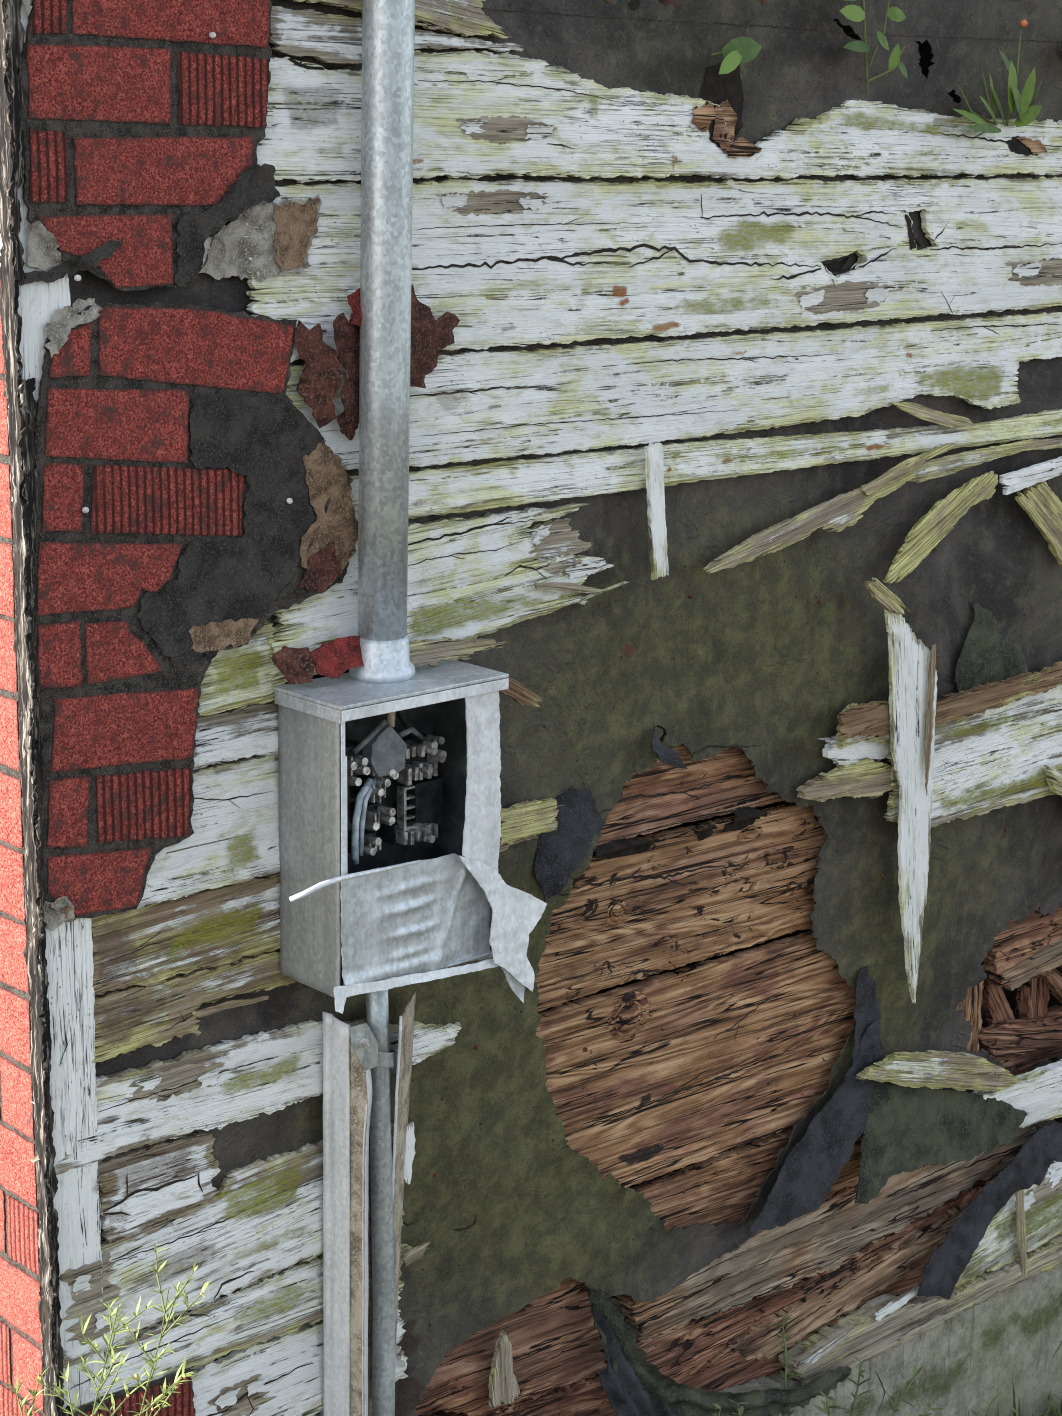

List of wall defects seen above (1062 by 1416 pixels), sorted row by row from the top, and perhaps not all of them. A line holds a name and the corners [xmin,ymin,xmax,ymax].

peeling [456,115,557,145]
spalling [692,100,762,158]
crack [921,131,1062,147]
spalling [1017,137,1047,155]
peeling [435,189,548,216]
crack [412,196,1060,289]
crack [933,293,1060,334]
crack [634,353,839,364]
peeling [531,518,606,580]
peeling [129,1062,226,1103]
peeling [208,1374,276,1416]